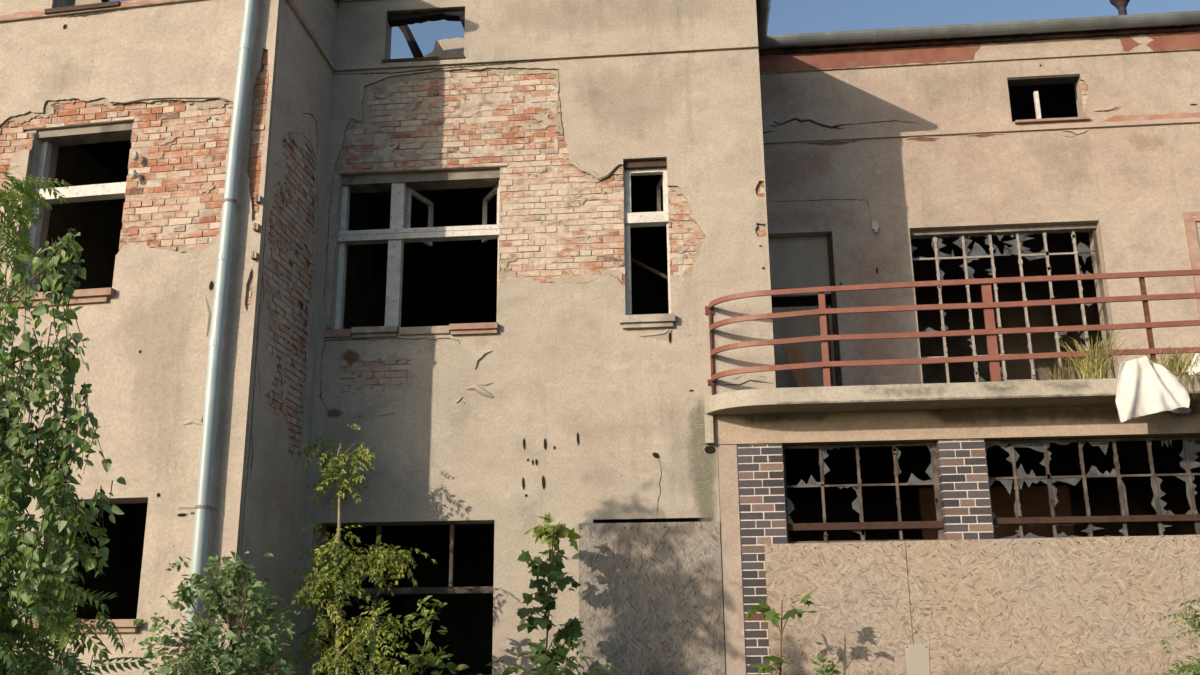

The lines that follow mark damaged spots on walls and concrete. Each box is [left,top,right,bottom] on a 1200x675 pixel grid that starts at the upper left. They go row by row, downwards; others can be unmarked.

peeling [759,44,981,73]
peeling [1117,32,1200,52]
crack [763,112,915,133]
flaking render [0,99,233,253]
flaking render [246,49,641,465]
flaking render [668,186,705,280]